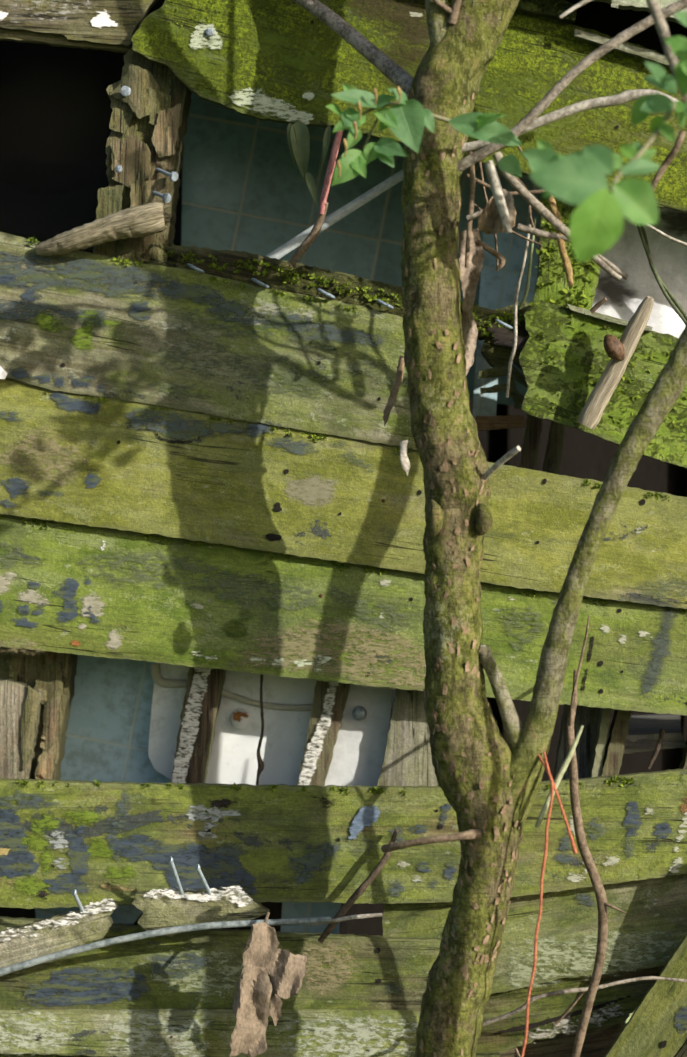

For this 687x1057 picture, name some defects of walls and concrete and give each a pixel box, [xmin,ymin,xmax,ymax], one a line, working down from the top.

peeling [27,0,118,27]